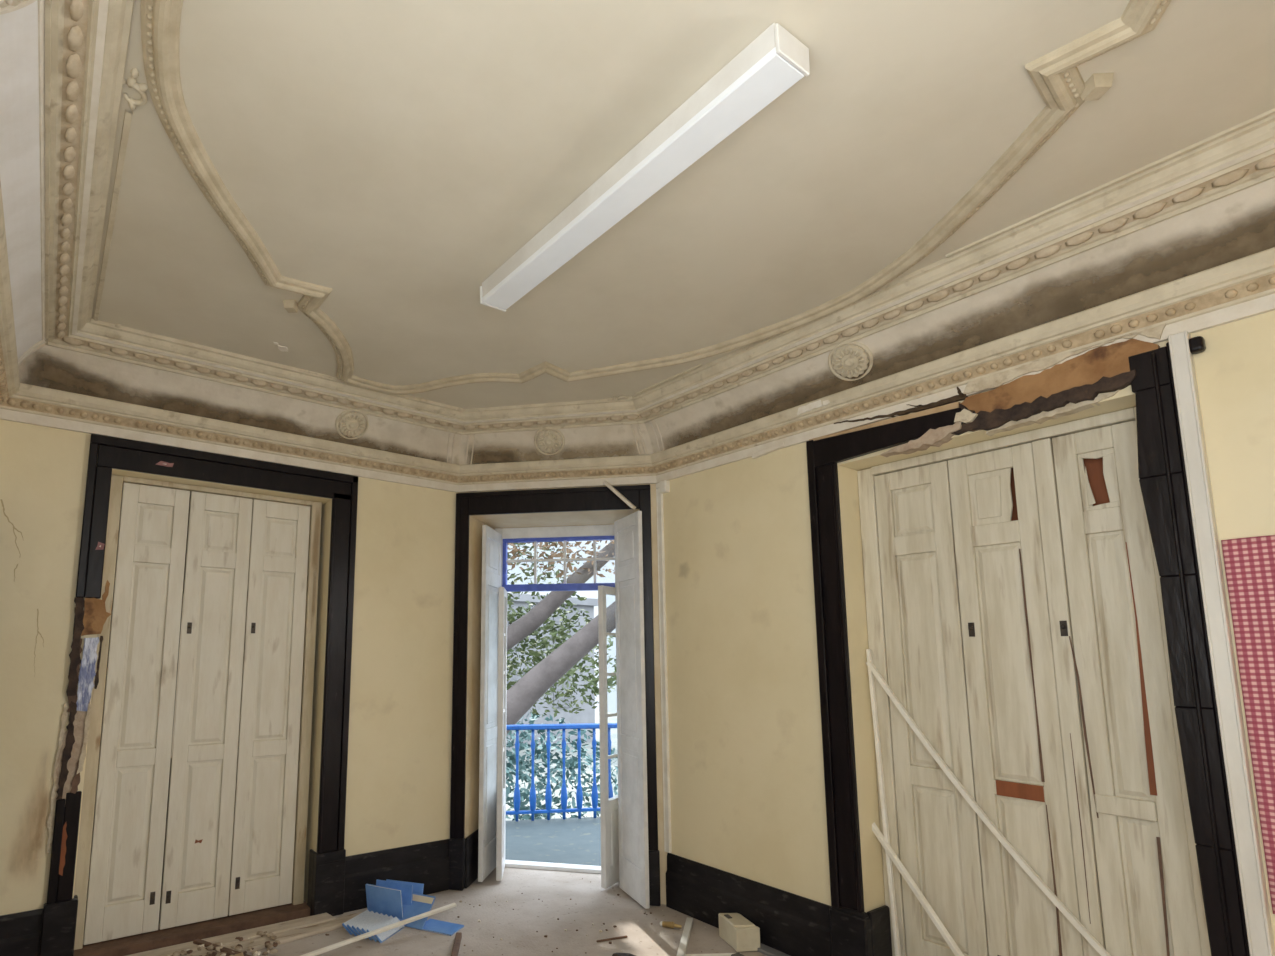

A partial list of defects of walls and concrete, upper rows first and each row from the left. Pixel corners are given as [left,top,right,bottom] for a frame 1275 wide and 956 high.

damp [30,356,444,462]
damp [673,208,1275,446]
spalling [881,322,1167,457]
crack [0,499,23,580]
spalling [47,580,111,876]